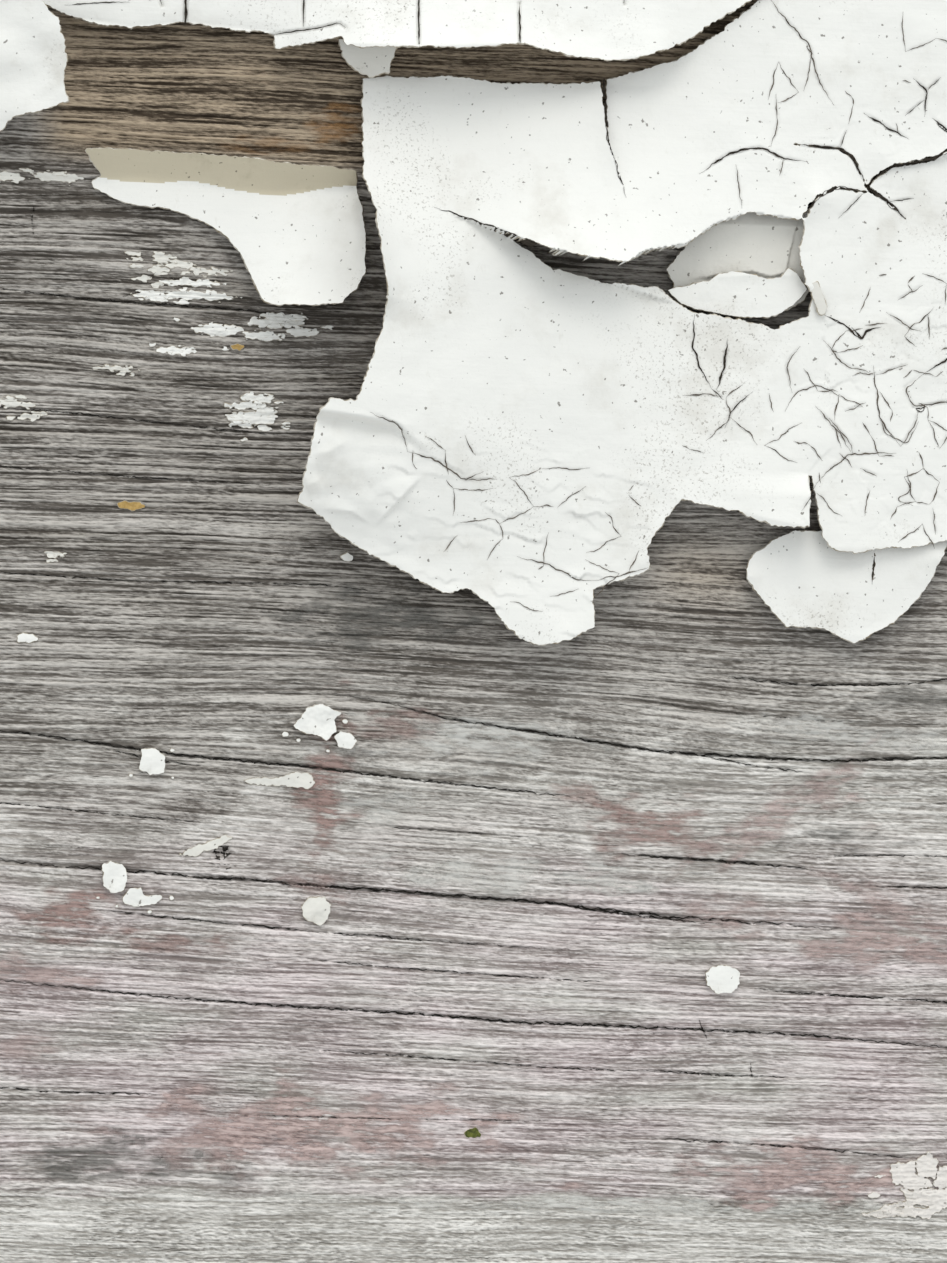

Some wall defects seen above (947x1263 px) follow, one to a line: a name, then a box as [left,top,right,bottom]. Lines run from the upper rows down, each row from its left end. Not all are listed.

crack [415,0,423,44]
crack [515,6,523,43]
crack [603,79,626,196]
crack [701,0,947,218]
crack [435,207,537,248]
peeling [0,0,947,646]
crack [684,274,947,549]
crack [374,414,646,612]
crack [334,693,947,772]
crack [1,858,854,930]